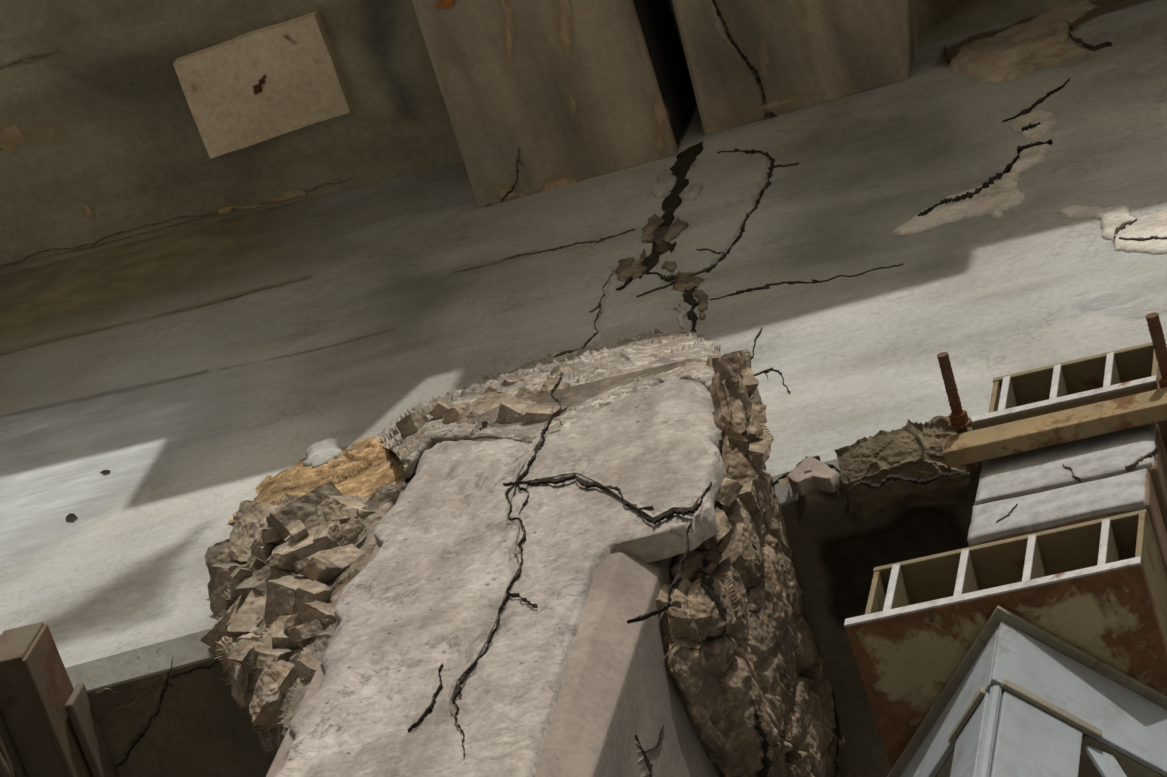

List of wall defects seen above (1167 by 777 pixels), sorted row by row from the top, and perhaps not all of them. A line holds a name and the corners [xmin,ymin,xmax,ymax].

crack [709,0,777,120]
spalling [943,0,1112,84]
spalling [891,79,1070,236]
peeling [1051,205,1167,255]
crack [407,141,904,777]
spalling [200,326,721,753]
crack [97,654,219,767]